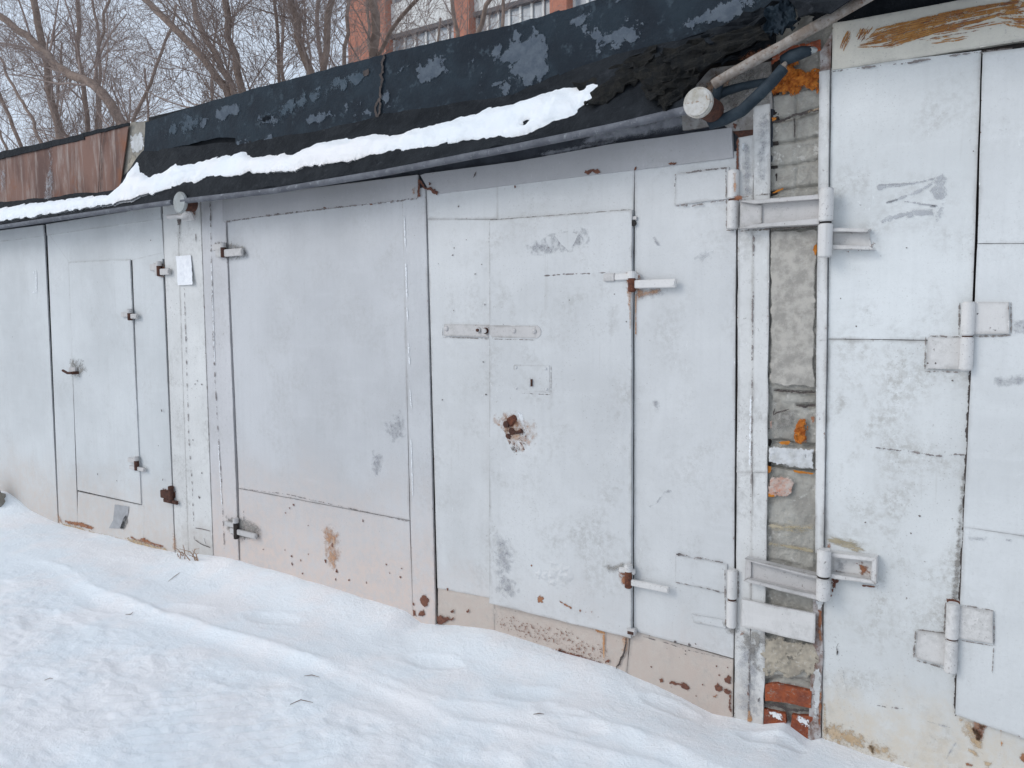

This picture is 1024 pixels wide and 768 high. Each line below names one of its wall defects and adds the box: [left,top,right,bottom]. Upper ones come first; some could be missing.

peeling [570,11,643,53]
peeling [682,0,755,30]
peeling [398,53,448,84]
peeling [489,26,549,96]
peeling [164,104,240,137]
peeling [257,69,372,140]
rust [499,412,530,452]
rust [324,528,337,568]
rust [412,595,469,625]
rust [497,617,610,665]
rust [659,665,732,712]
rust [960,720,991,766]